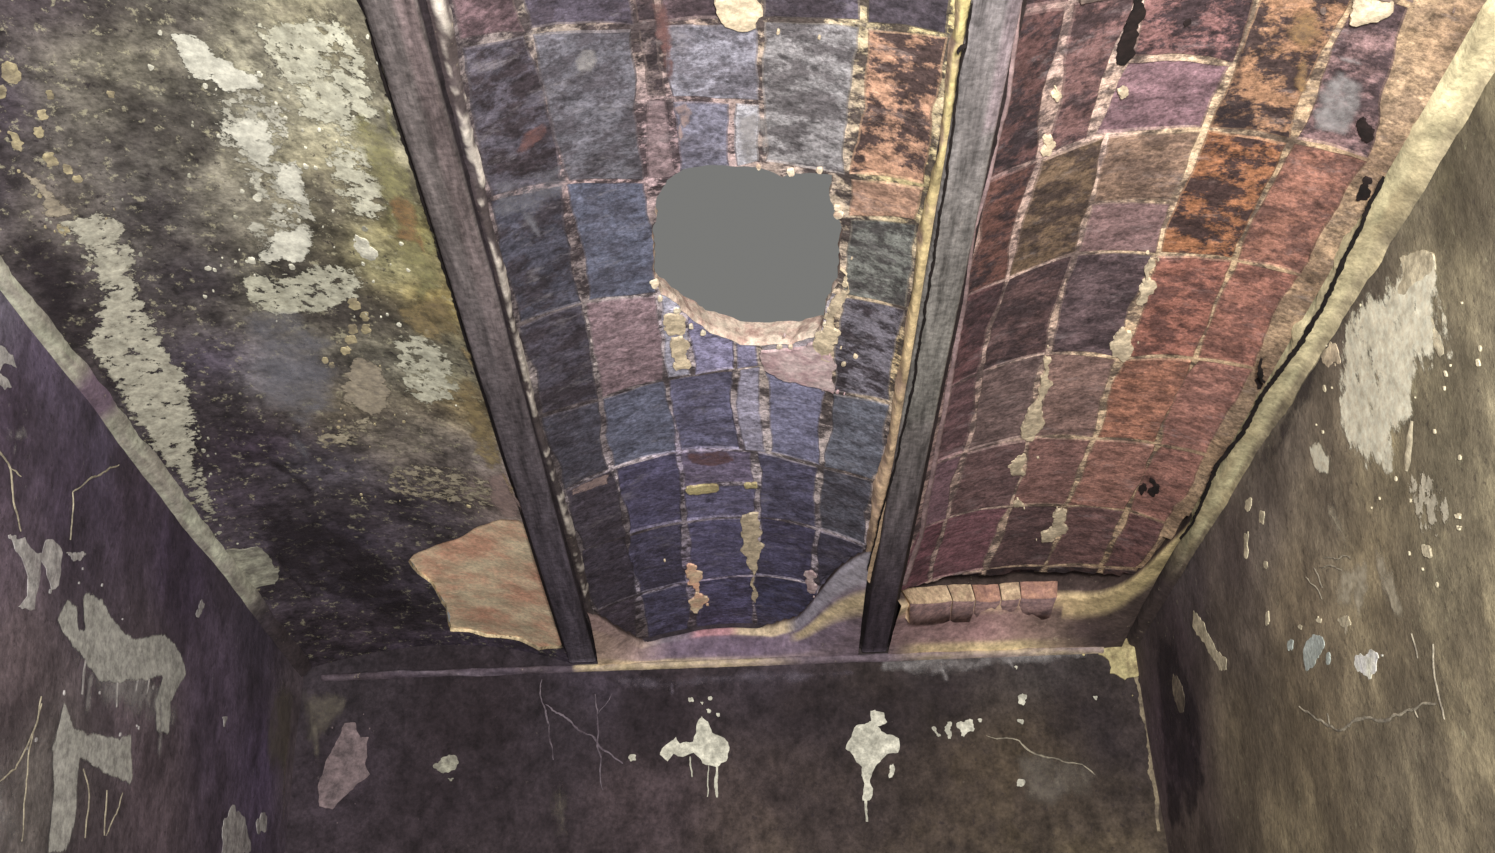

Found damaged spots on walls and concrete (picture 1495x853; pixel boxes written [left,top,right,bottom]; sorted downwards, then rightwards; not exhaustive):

spalling [1116,0,1146,66]
peeling [158,16,460,461]
water stain [359,117,437,295]
peeling [0,90,280,588]
spalling [360,465,562,647]
water stain [488,474,521,517]
crack [1179,176,1385,540]
peeling [1321,250,1462,587]
peeling [8,534,186,853]
peeling [318,714,370,824]
spalling [660,696,730,797]
spalling [846,710,900,822]